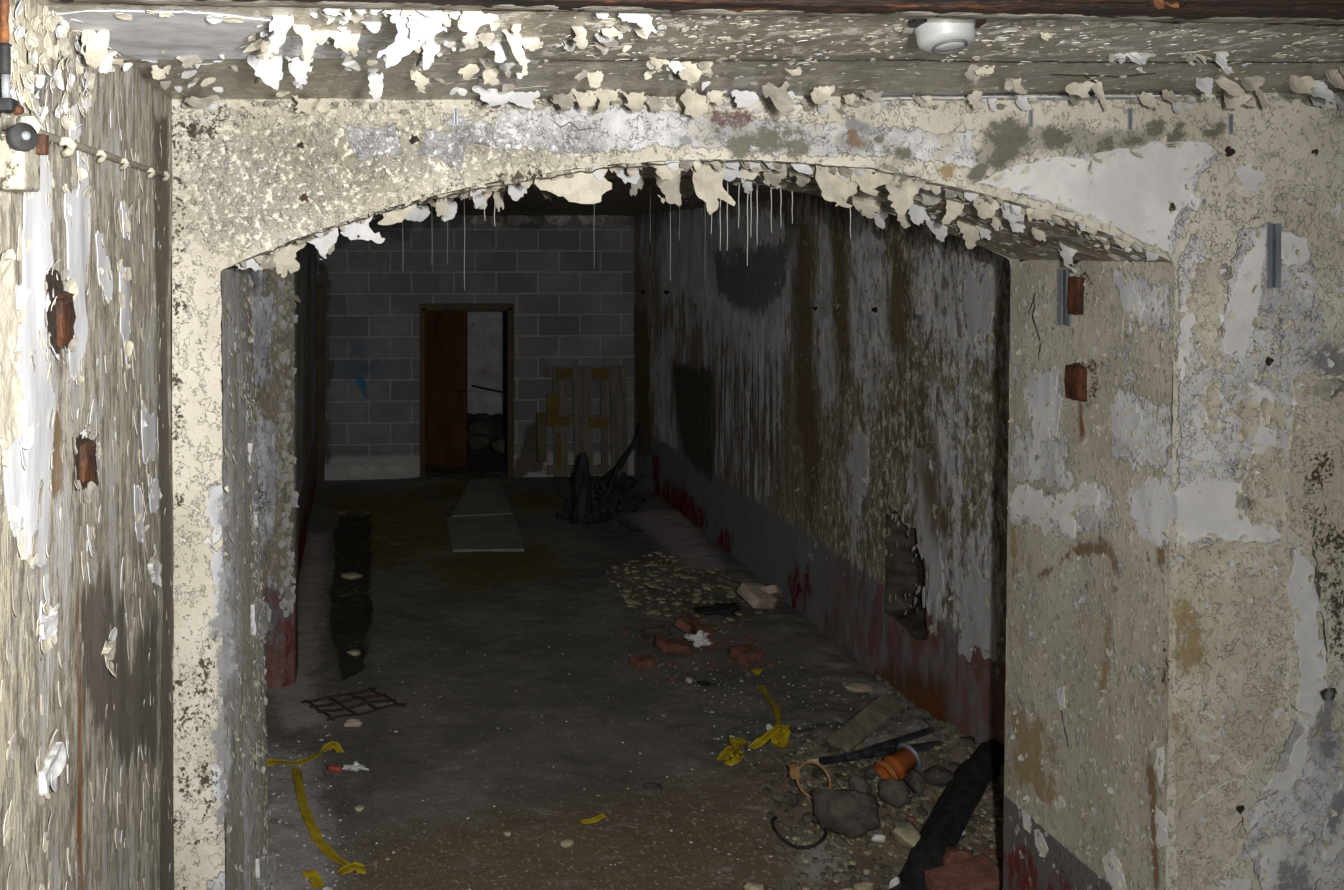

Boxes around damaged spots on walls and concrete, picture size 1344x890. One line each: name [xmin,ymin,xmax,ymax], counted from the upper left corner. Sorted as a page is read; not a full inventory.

damp [634,310,650,459]
flaking render [0,0,1344,708]
damp [673,359,712,480]
damp [715,217,819,506]
damp [833,228,848,391]
damp [889,244,909,352]
damp [80,100,266,890]
peeling [6,694,44,778]
peeling [90,743,172,890]